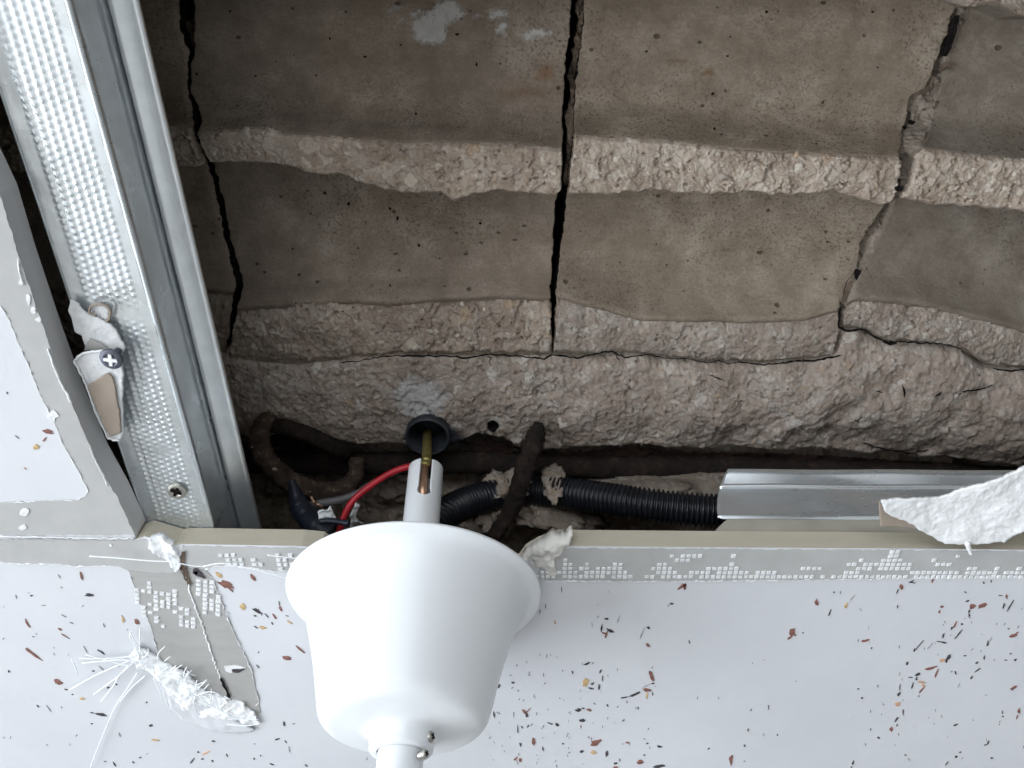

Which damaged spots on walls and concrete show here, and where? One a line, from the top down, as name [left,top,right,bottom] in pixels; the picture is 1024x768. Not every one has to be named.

spalling [0,125,26,172]
crack [179,0,243,350]
spalling [169,126,1024,212]
crack [340,0,962,381]
spalling [207,292,1024,366]
crack [934,368,1024,397]